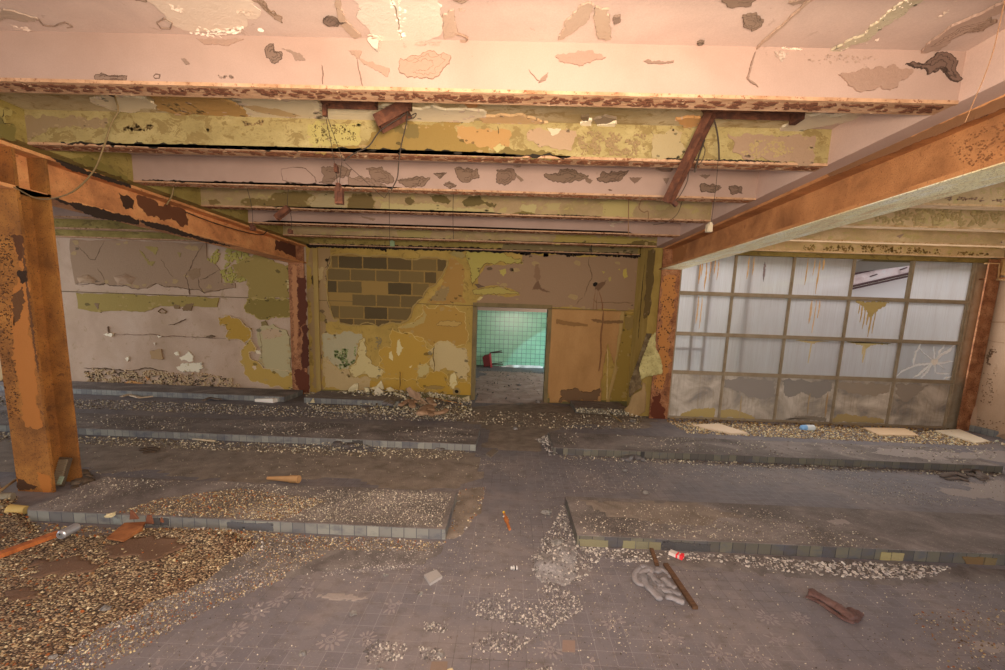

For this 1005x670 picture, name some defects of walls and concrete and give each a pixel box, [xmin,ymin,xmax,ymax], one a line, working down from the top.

rust [0,83,944,113]
rust [691,96,1005,177]
rust [33,141,682,247]
rust [10,234,43,430]
flaking render [69,239,293,390]
rust [209,206,694,393]
flaking render [296,225,657,401]
water stain [681,408,755,419]
water stain [724,376,890,399]
water stain [847,341,891,349]
water stain [855,301,889,317]
crack [896,344,955,379]